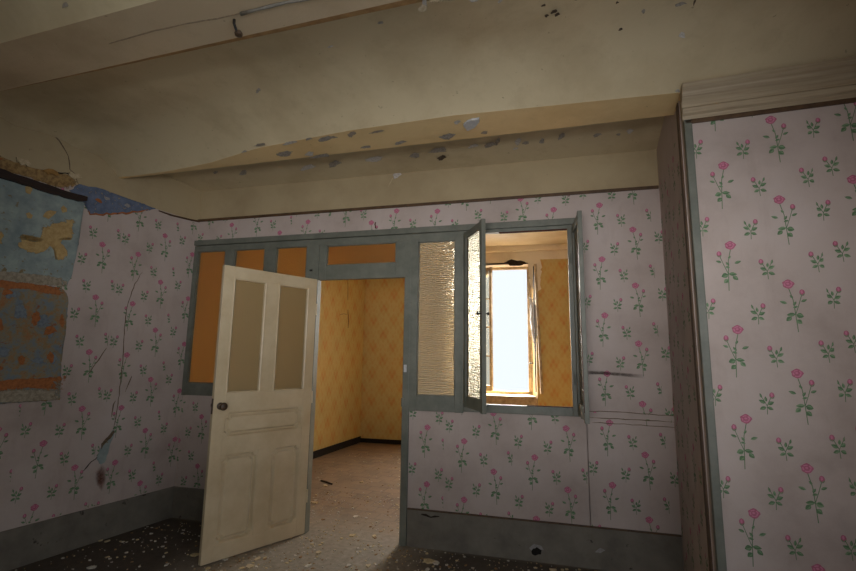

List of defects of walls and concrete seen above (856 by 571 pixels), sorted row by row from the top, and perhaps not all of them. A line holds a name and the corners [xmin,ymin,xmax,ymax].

peeling [276,132,356,171]
peeling [410,117,500,161]
peeling [0,156,155,404]
crack [88,275,140,430]